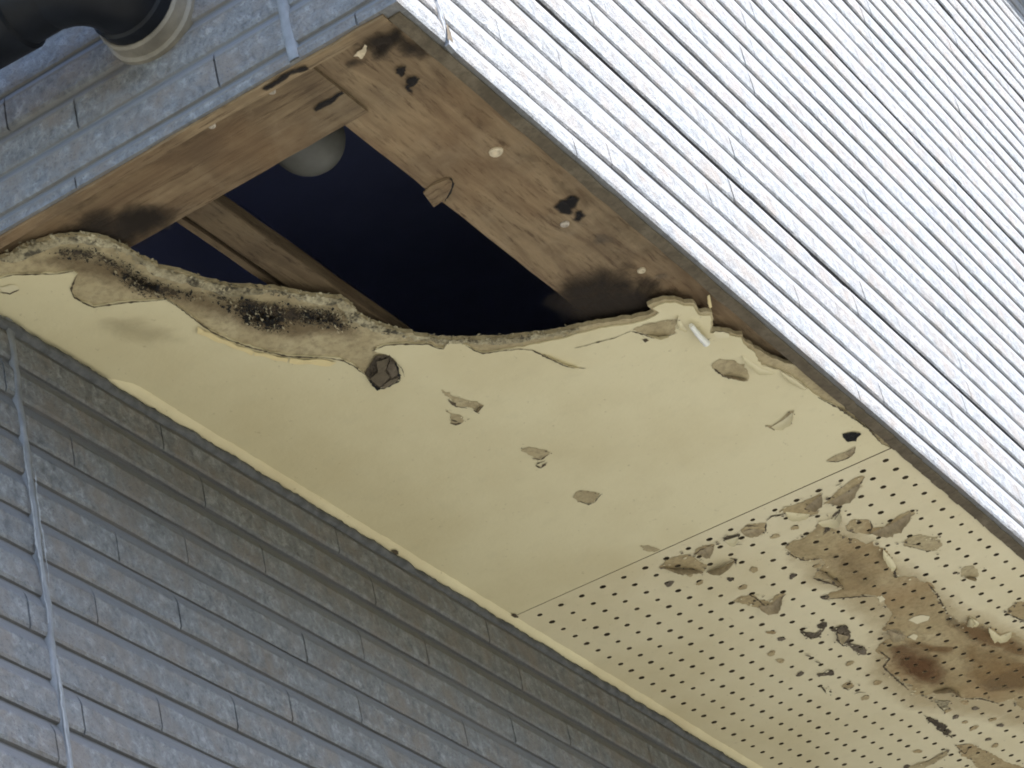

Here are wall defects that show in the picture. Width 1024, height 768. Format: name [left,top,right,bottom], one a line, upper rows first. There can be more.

leakage [366,30,428,93]
leakage [555,196,585,222]
leakage [49,245,357,334]
leakage [553,271,657,323]
peeling [197,327,335,366]
peeling [634,320,680,340]
spalling [365,354,404,391]
peeling [711,356,806,390]
peeling [441,390,484,425]
peeling [573,490,600,506]
peeling [641,476,1024,768]
leakage [964,626,1024,679]